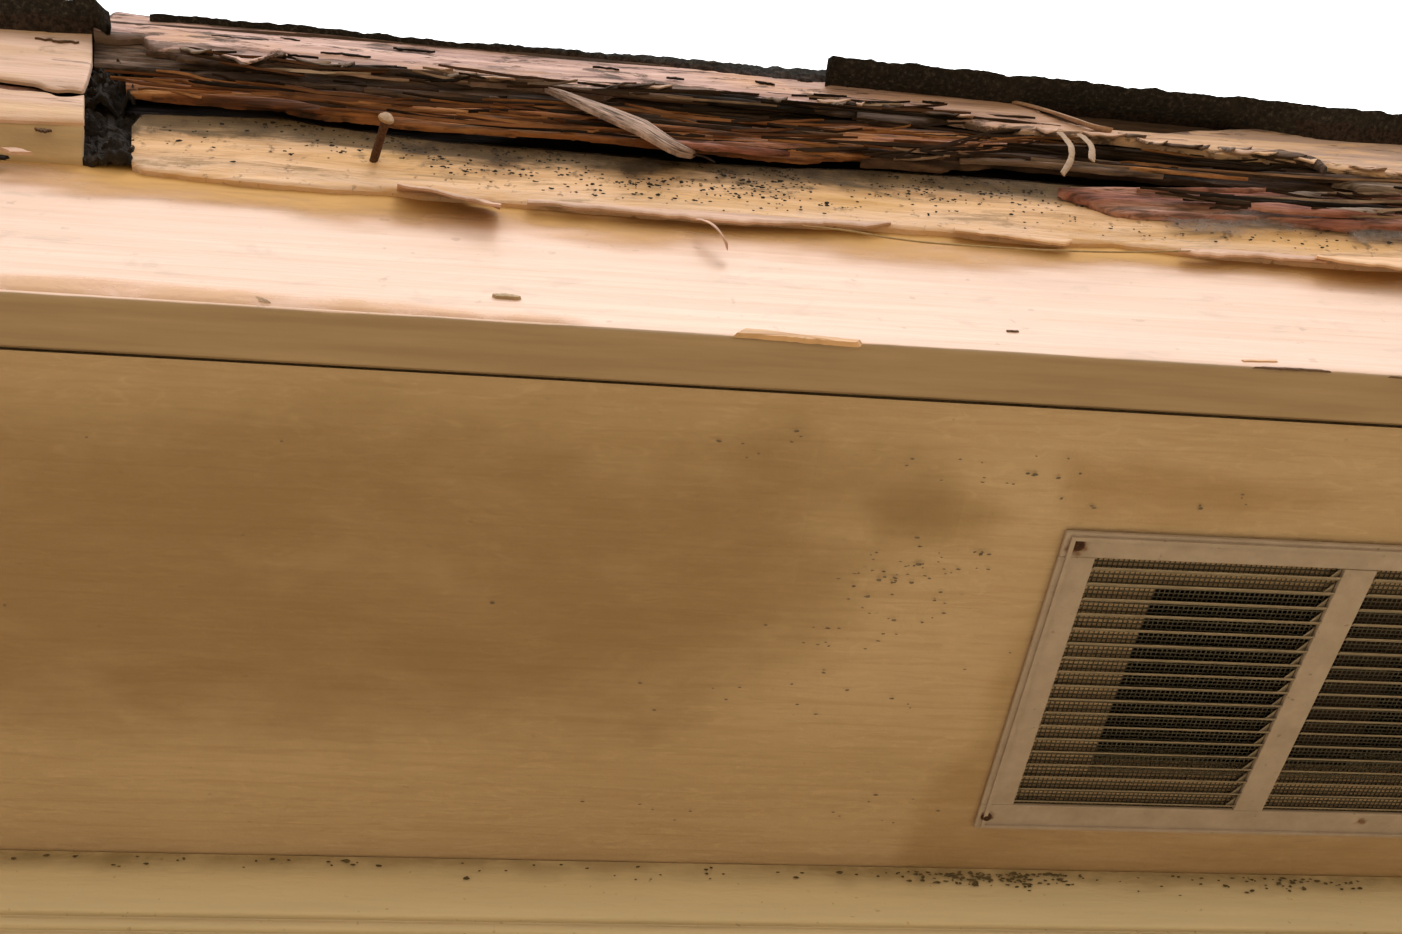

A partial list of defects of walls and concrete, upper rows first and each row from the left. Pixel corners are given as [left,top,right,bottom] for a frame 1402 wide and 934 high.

peeling [179,47,397,68]
peeling [816,99,904,108]
peeling [1012,101,1318,164]
peeling [397,183,501,210]
water stain [0,115,1402,283]
peeling [527,199,891,229]
peeling [1057,187,1402,233]
peeling [953,227,1072,246]
peeling [1180,248,1402,271]
water stain [836,537,991,623]
water stain [877,871,1098,891]
water stain [1160,875,1363,893]